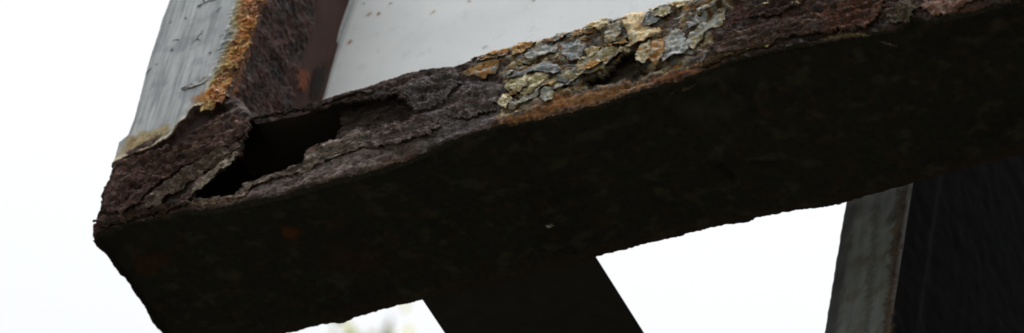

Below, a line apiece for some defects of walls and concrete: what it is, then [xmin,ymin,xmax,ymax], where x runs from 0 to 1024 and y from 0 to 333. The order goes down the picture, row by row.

corrosion [92,0,264,228]
peeling [335,0,726,148]
corrosion [506,0,974,122]